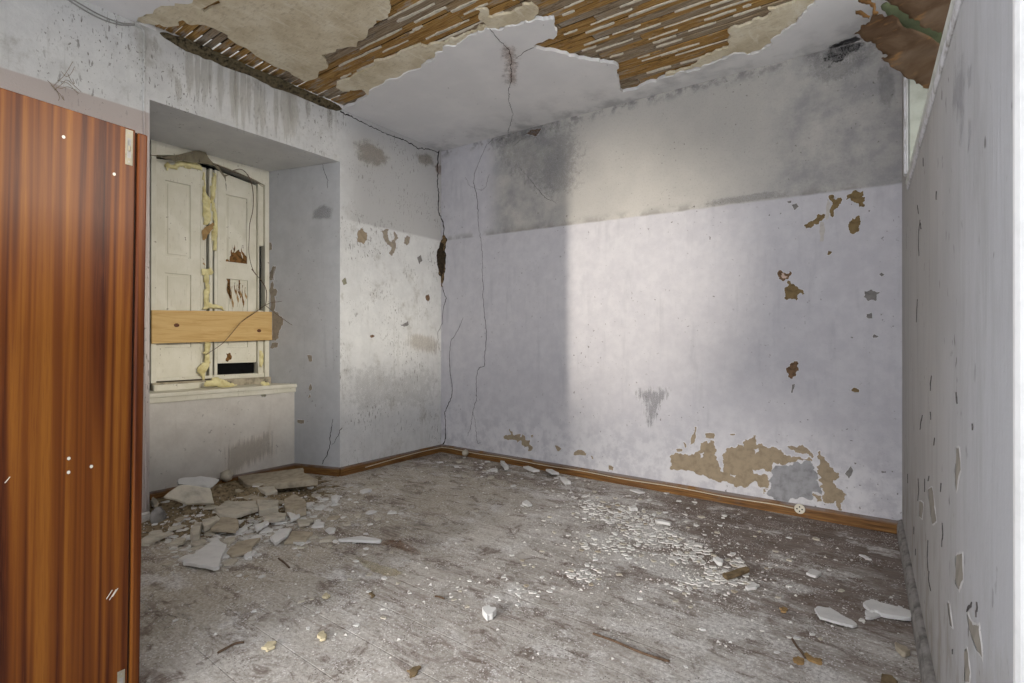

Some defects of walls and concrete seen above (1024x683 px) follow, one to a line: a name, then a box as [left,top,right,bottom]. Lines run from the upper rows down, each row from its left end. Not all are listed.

flaking render [137,0,814,105]
damp [824,36,864,67]
crack [340,111,445,235]
peeling [356,228,368,244]
peeling [381,228,410,256]
crack [438,29,554,444]
peeling [803,189,866,256]
peeling [776,269,805,301]
peeling [503,428,534,452]
peeling [669,426,857,511]
peeling [907,474,943,547]
peeling [952,602,983,683]